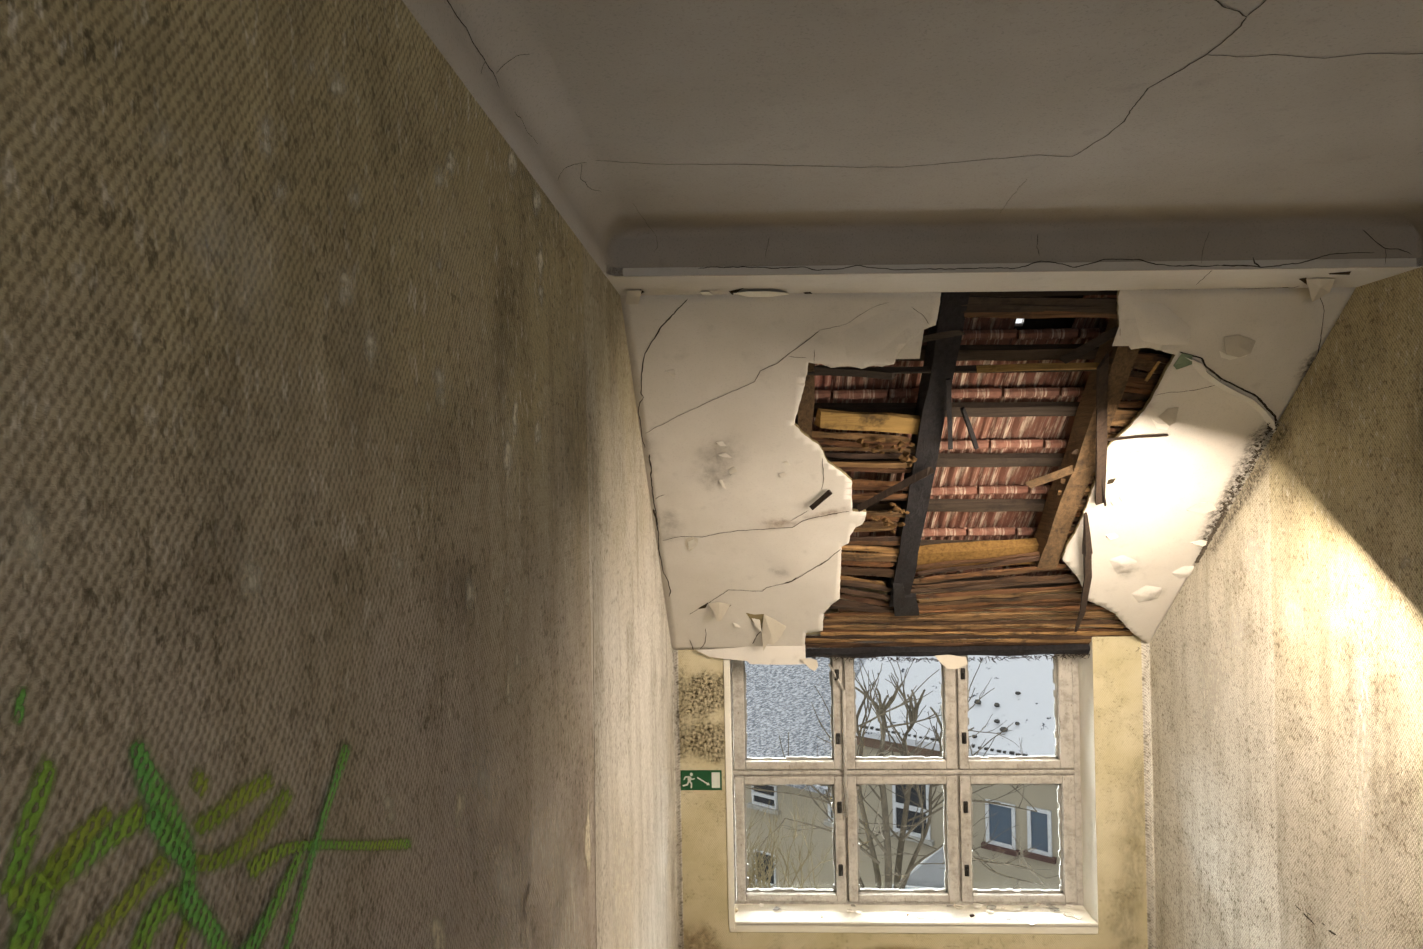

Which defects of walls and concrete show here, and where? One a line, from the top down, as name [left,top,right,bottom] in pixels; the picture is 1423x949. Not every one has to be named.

crack [447,0,537,143]
crack [907,0,1423,204]
crack [638,230,1409,649]
peeling [1151,407,1179,430]
water stain [1203,428,1287,551]